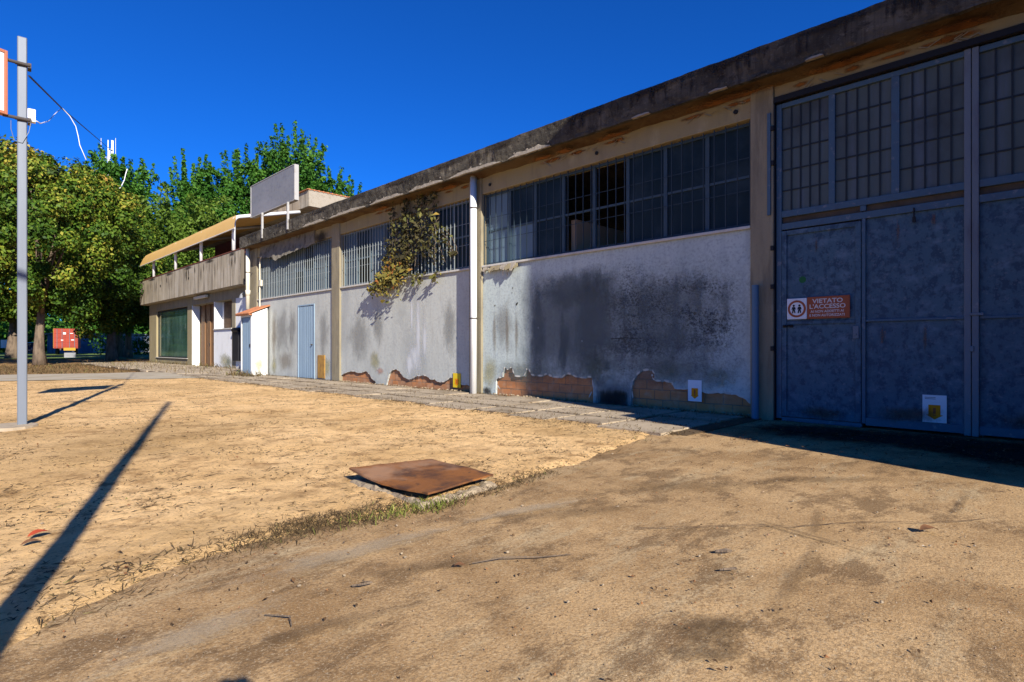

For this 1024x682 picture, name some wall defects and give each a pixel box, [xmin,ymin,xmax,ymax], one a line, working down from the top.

flaking render [343,368,469,392]
flaking render [496,367,594,403]
flaking render [631,369,750,417]